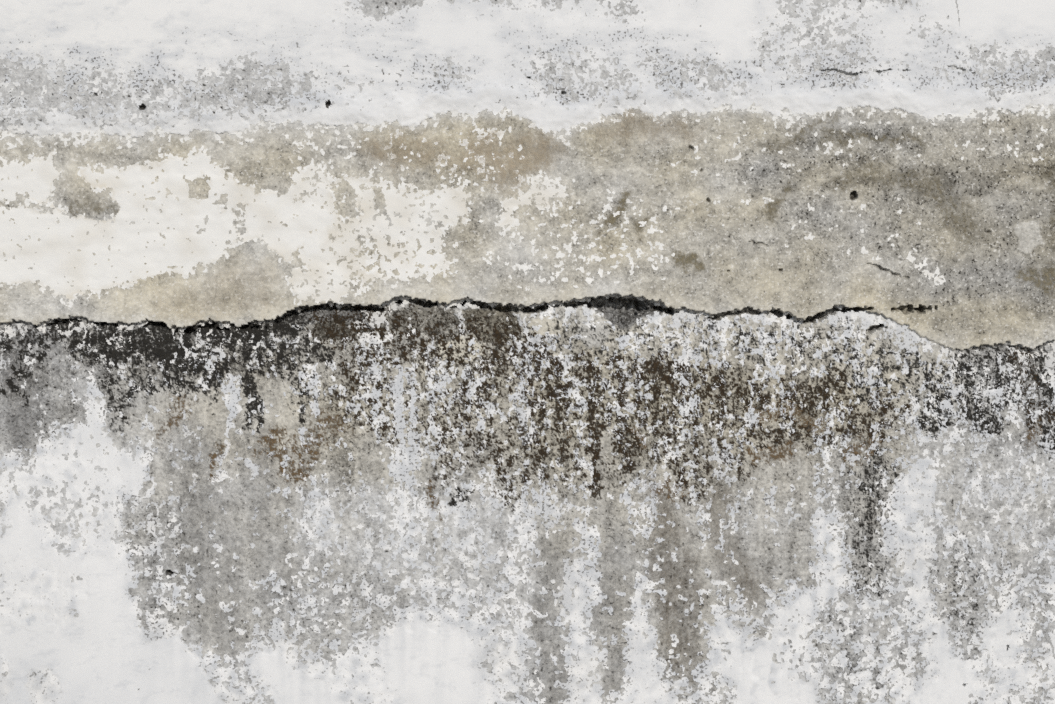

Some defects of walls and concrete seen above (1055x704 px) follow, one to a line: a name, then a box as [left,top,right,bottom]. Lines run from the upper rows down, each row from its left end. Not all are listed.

peeling [0,52,383,150]
peeling [459,132,505,193]
peeling [472,125,511,146]
water stain [465,134,550,183]
peeling [505,44,759,176]
peeling [761,110,866,172]
crack [748,239,769,247]
crack [0,296,679,336]
crack [708,263,938,334]
crack [965,339,1055,354]
peeling [0,142,1055,704]
water stain [0,304,1055,600]